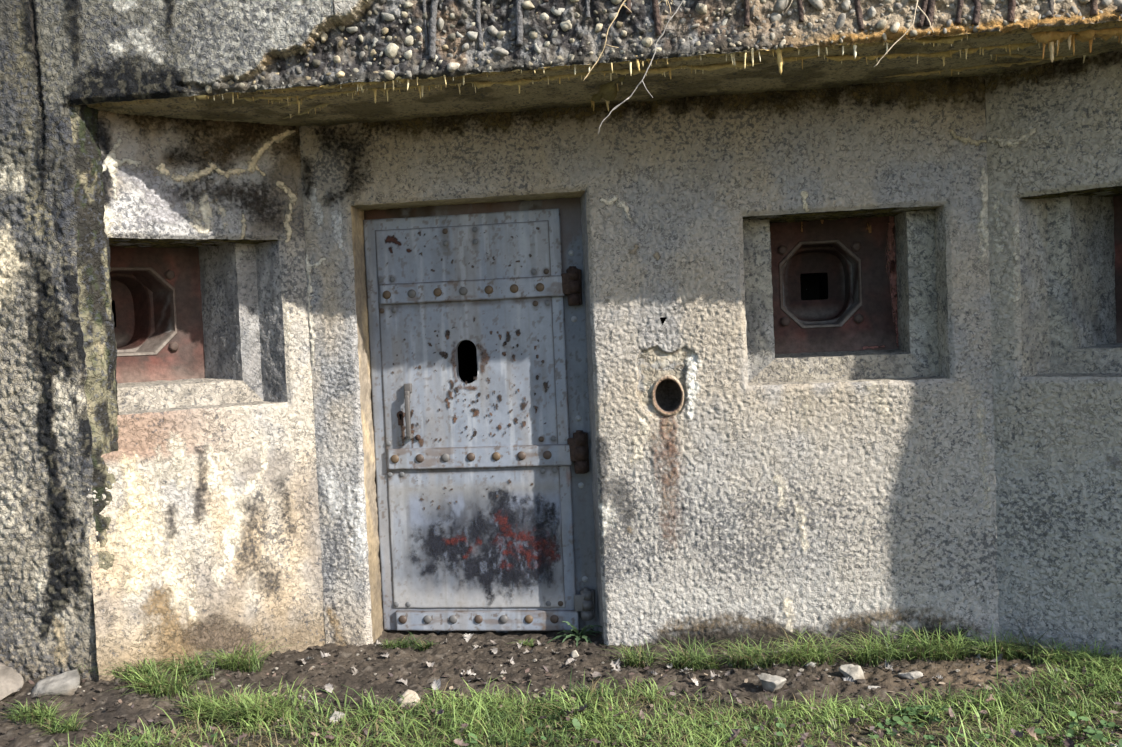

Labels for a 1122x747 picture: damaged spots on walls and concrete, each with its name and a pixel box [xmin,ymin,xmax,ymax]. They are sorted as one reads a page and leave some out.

spalling [183,0,1122,96]
rust [831,11,1122,43]
damp [95,118,120,237]
damp [124,27,1122,251]
crack [102,130,327,364]
rust [385,232,436,264]
damp [0,223,101,665]
damp [116,432,281,665]
damp [322,469,367,566]
rust [400,327,549,448]
rust [654,414,679,535]
spalling [637,346,697,419]